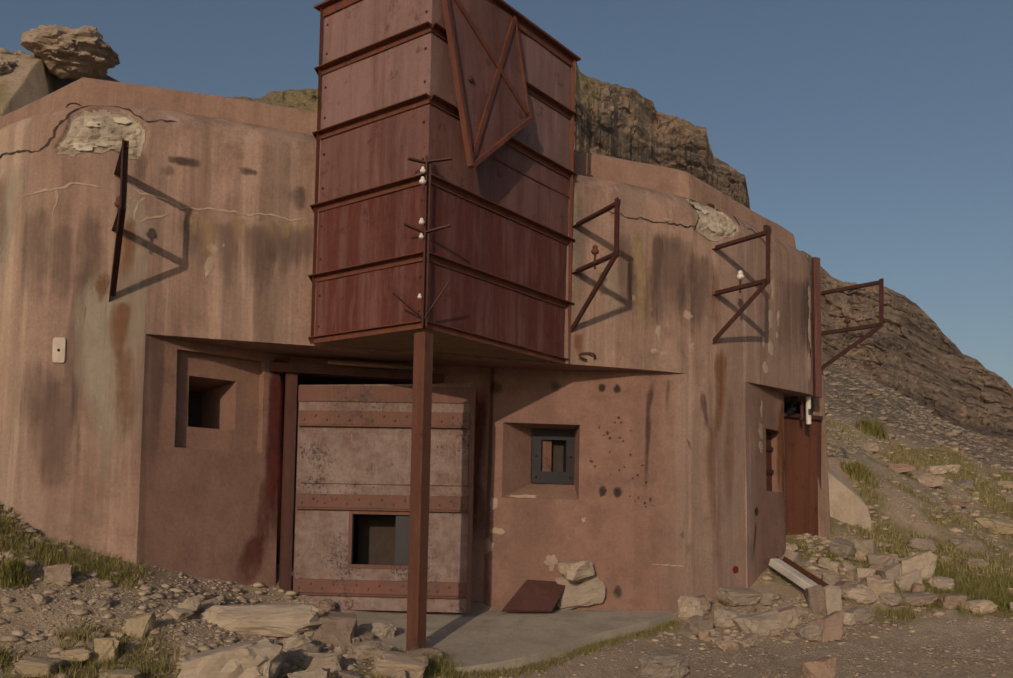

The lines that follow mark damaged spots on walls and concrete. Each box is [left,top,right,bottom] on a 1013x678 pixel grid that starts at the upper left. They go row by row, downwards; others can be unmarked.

crack [0,105,178,158]
spalling [56,109,146,159]
damp [77,281,118,441]
damp [634,237,647,312]
spalling [685,198,739,242]
peeling [762,261,780,374]
rust [245,375,282,566]
rust [473,394,486,525]